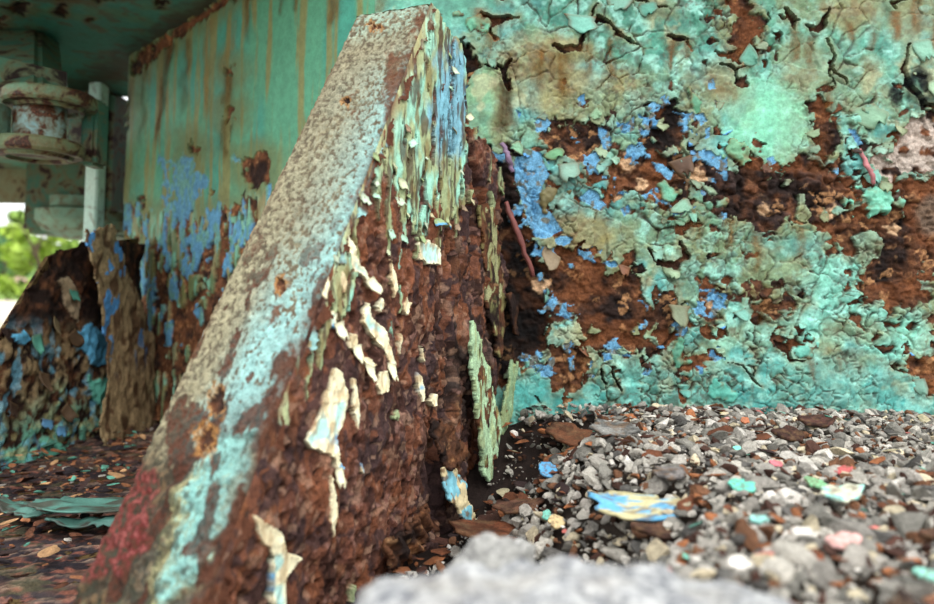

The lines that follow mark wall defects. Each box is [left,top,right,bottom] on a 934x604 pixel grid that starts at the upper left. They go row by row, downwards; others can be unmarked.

crack [480,0,520,91]
crack [552,2,640,54]
crack [783,6,849,86]
crack [900,42,934,111]
corrosion [274,278,286,296]
peeling [278,4,499,532]
peeling [487,80,934,404]
corrosion [428,203,519,482]
corrosion [193,385,225,454]
peeling [253,514,303,604]
corrosion [448,498,545,542]
peeling [587,490,682,522]